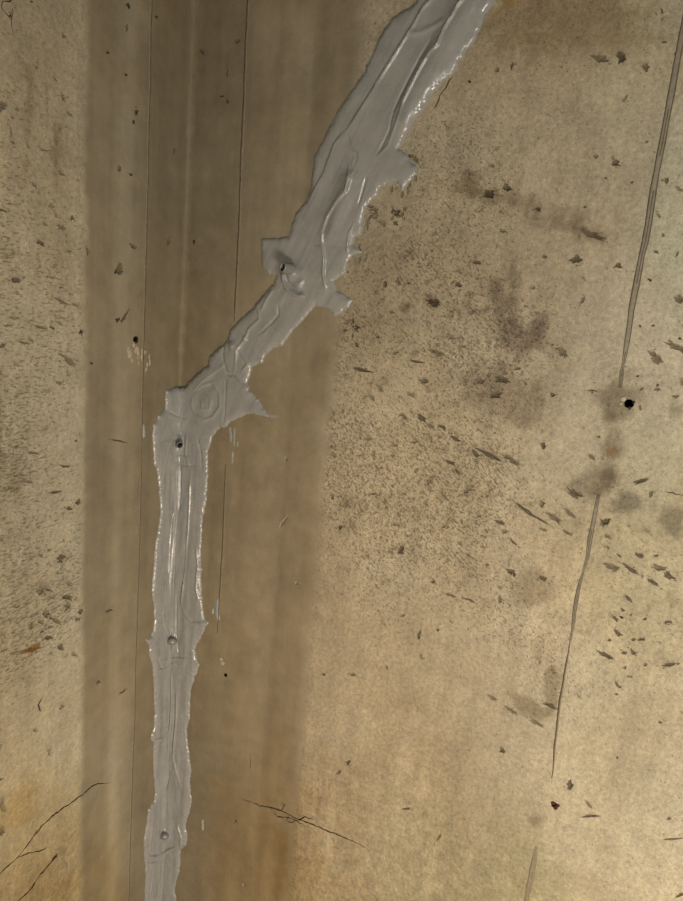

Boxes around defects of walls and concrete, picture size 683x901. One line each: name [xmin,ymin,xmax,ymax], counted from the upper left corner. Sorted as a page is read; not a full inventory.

crack [0,781,112,901]
crack [243,799,370,853]